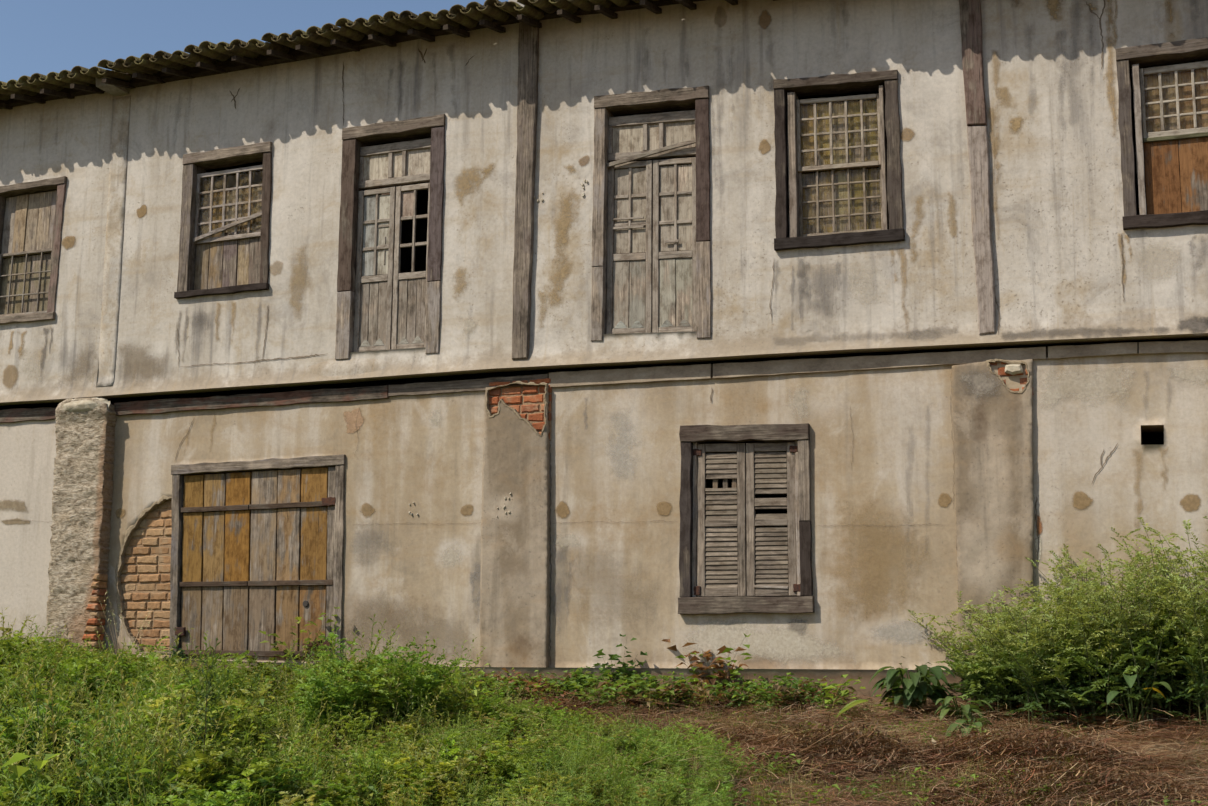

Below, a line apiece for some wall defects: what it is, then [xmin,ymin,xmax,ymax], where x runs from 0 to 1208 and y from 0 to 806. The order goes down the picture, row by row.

crack [1086,0,1105,69]
peeling [456,164,493,200]
peeling [539,166,588,320]
water stain [909,330,938,339]
flaking render [986,358,1034,395]
flaking render [485,378,552,441]
crack [1092,443,1118,483]
peeling [0,500,30,525]
flaking render [82,494,184,656]